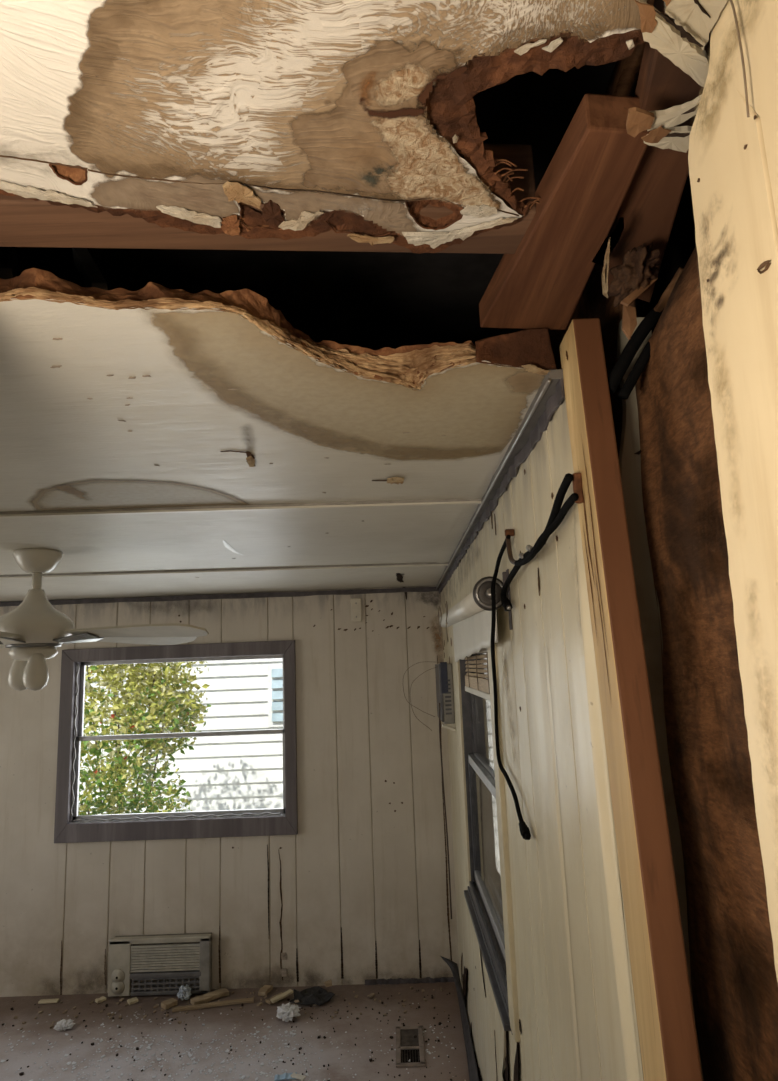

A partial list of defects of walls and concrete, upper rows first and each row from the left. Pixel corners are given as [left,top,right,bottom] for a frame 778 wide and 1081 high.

peeling [514,37,563,55]
water stain [698,16,742,128]
water stain [63,0,647,238]
peeling [0,180,98,208]
peeling [156,181,324,236]
peeling [347,204,518,249]
water stain [709,250,725,305]
water stain [153,311,545,460]
peeling [521,364,550,375]
water stain [692,354,708,390]
water stain [32,480,247,510]